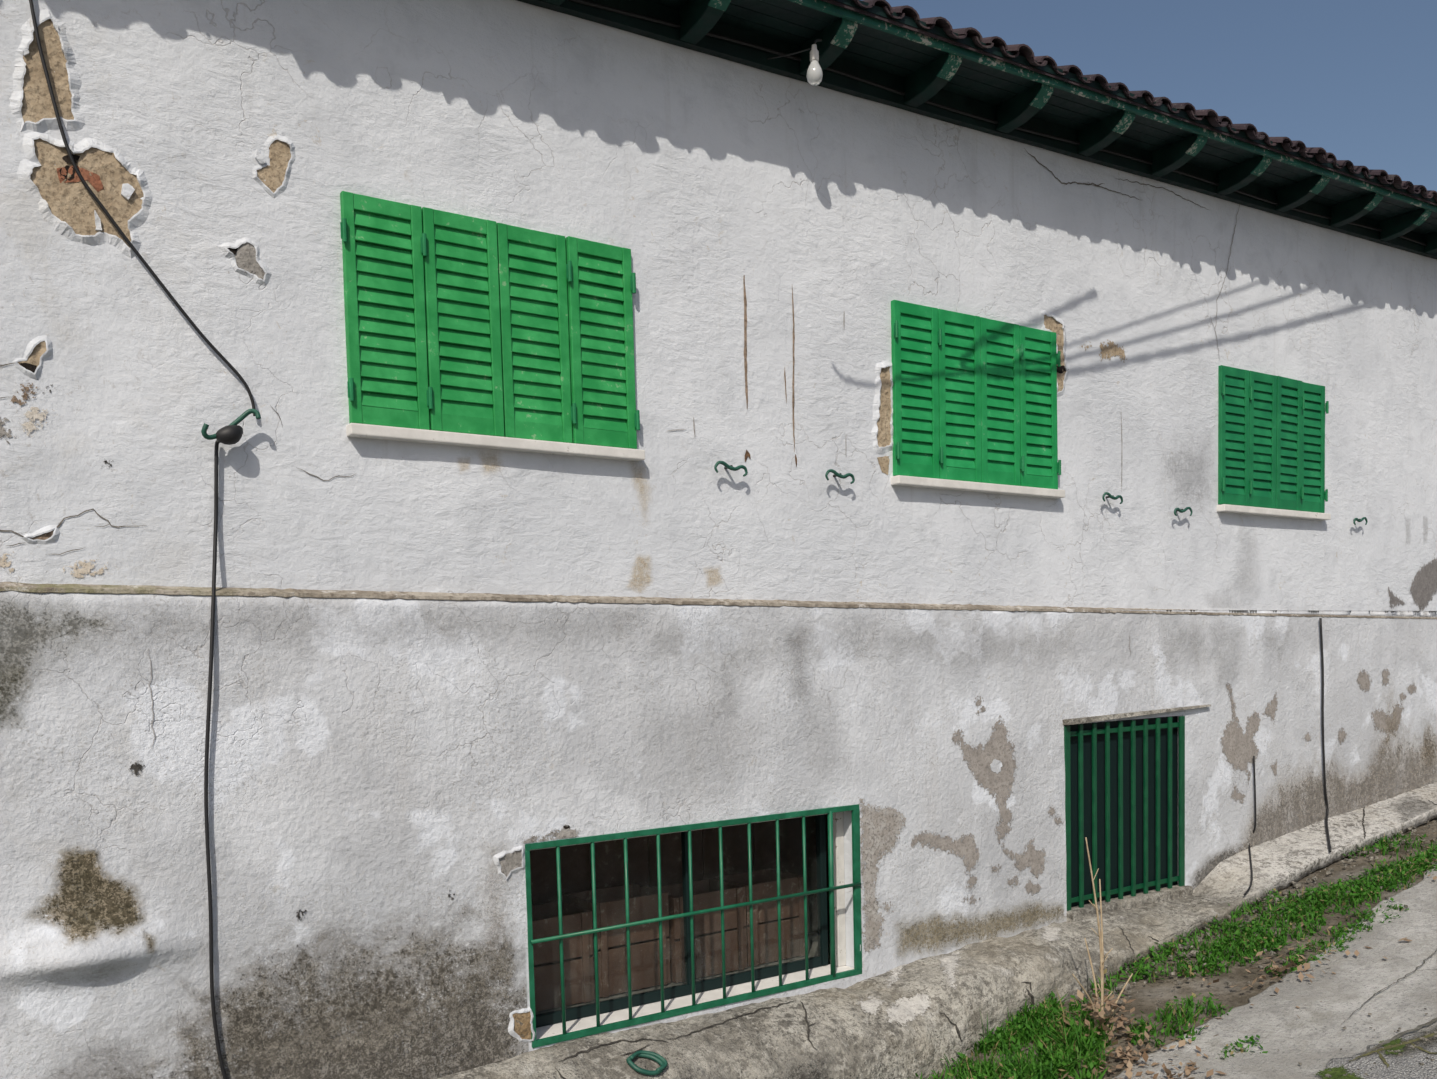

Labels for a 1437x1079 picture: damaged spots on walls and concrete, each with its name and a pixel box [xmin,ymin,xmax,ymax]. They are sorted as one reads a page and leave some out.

spalling [9,9,153,259]
spalling [252,134,296,198]
crack [1024,148,1240,359]
spalling [1040,310,1127,397]
spalling [871,360,893,475]
crack [0,509,146,555]
leakage [0,601,103,727]
peeling [1220,683,1278,806]
peeling [1357,668,1417,734]
peeling [859,696,1048,952]
spalling [34,846,153,953]
leakage [93,912,529,1079]